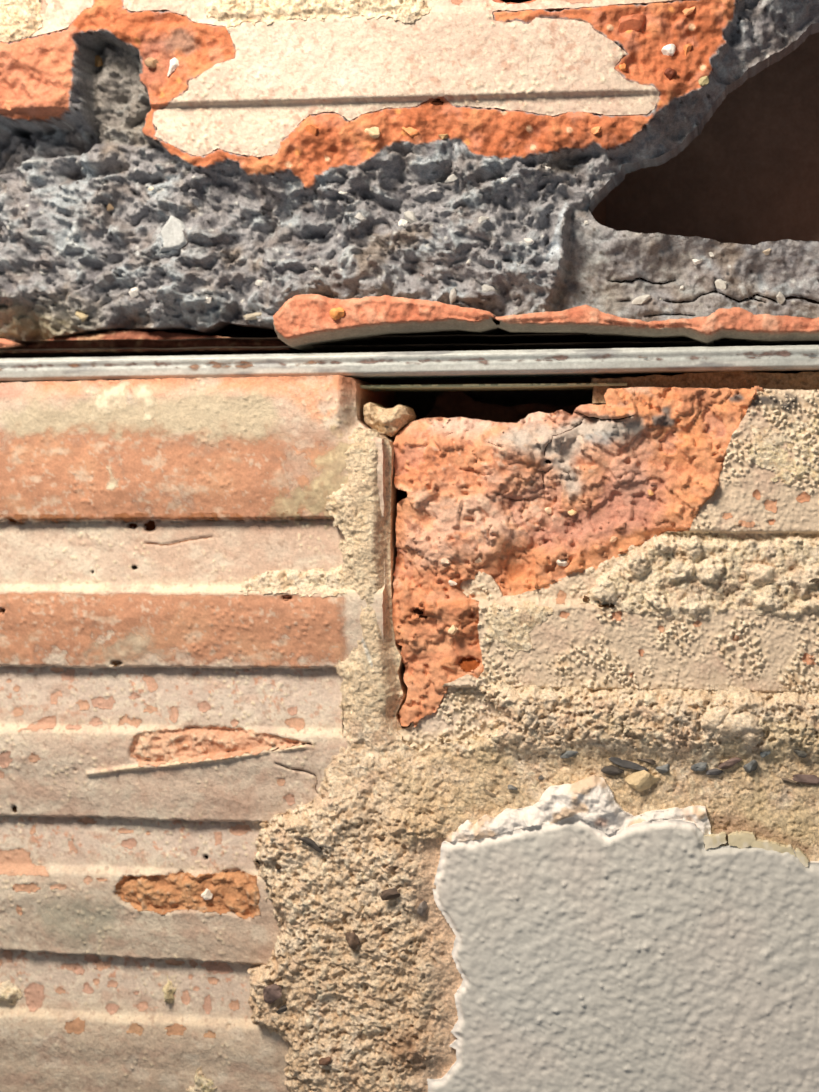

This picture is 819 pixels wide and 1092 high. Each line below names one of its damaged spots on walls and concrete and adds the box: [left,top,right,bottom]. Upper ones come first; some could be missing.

spalling [0,0,819,359]
crack [608,277,819,316]
peeling [752,489,777,525]
peeling [796,492,811,503]
spalling [392,386,763,727]
peeling [0,592,345,767]
peeling [0,751,13,779]
peeling [118,828,150,849]
peeling [214,824,251,845]
flaking render [445,757,809,867]
peeling [0,848,67,893]
spalling [83,860,261,919]